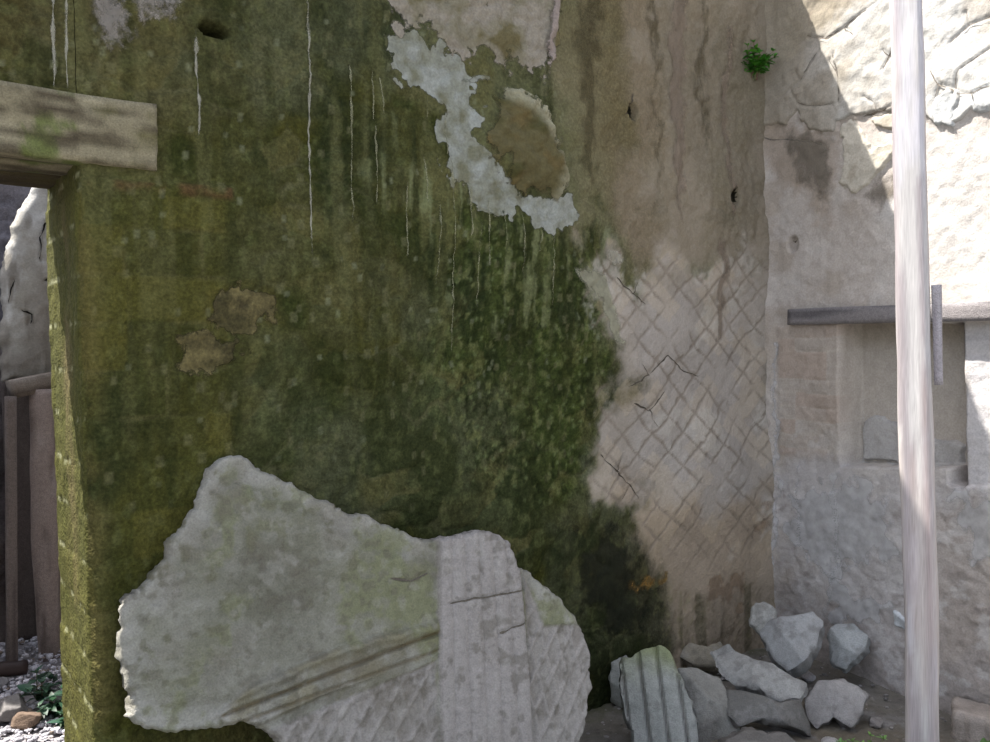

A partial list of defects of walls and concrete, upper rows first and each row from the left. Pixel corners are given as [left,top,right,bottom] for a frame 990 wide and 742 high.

flaking render [388,0,562,79]
crack [798,10,866,106]
crack [930,48,990,105]